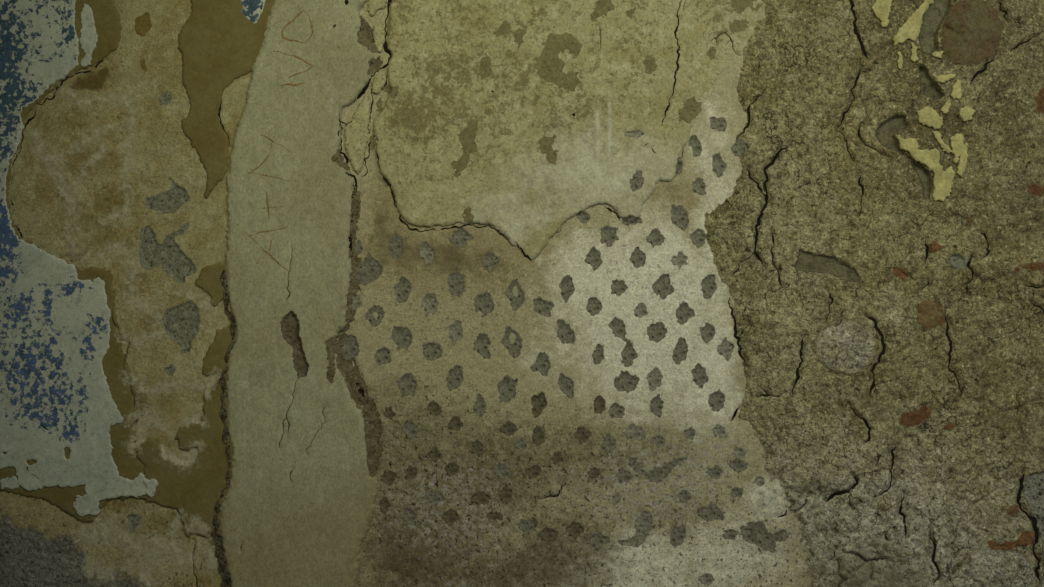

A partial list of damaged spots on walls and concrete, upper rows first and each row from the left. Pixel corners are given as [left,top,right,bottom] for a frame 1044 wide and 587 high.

spalling [357,14,383,75]
peeling [533,32,582,92]
crack [736,82,764,140]
crack [837,0,891,214]
peeling [0,0,158,517]
spalling [280,311,309,378]
crack [727,147,788,366]
crack [731,338,804,421]
spalling [704,0,1044,587]
crack [778,292,940,587]
spalling [0,508,146,587]
crack [1017,472,1040,581]